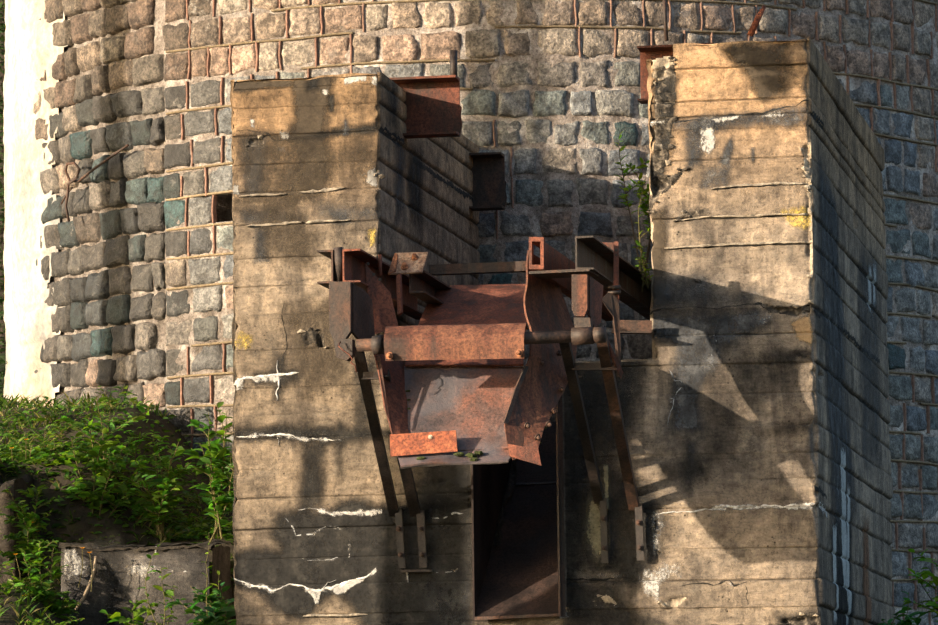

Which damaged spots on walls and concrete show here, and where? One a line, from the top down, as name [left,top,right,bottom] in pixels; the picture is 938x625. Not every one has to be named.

spalling [646,56,690,214]
crack [234,305,299,400]
crack [237,433,334,445]
crack [287,508,382,536]
crack [659,485,828,517]
crack [233,554,376,604]